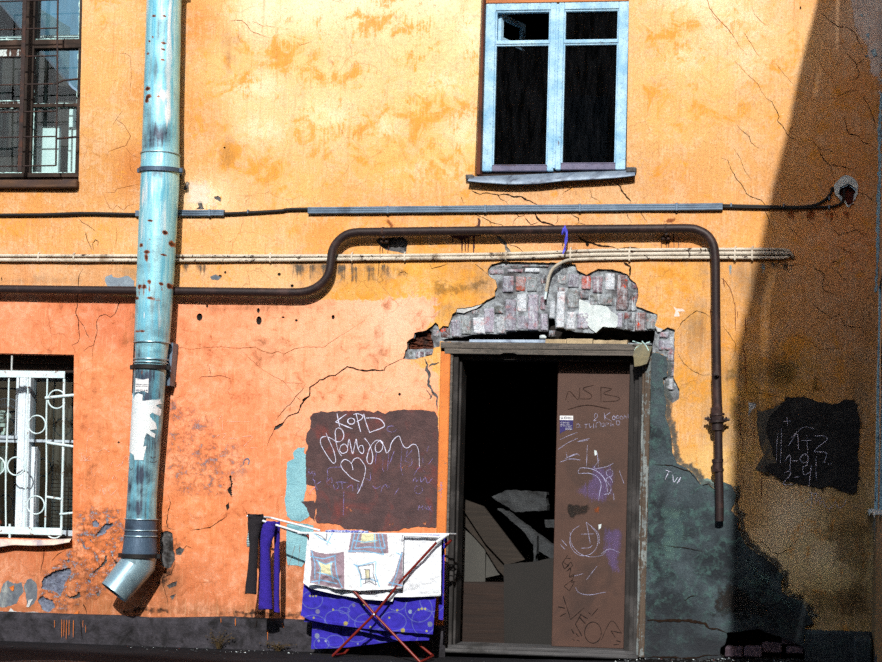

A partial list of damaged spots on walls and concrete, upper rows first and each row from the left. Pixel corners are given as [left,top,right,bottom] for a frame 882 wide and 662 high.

crack [77,114,136,247]
crack [707,0,882,335]
spalling [834,175,858,207]
peeling [851,0,882,292]
crack [73,266,120,361]
spalling [403,235,680,403]
crack [180,346,404,445]
crack [425,360,439,407]
spalling [0,559,80,612]
spalling [720,629,805,660]